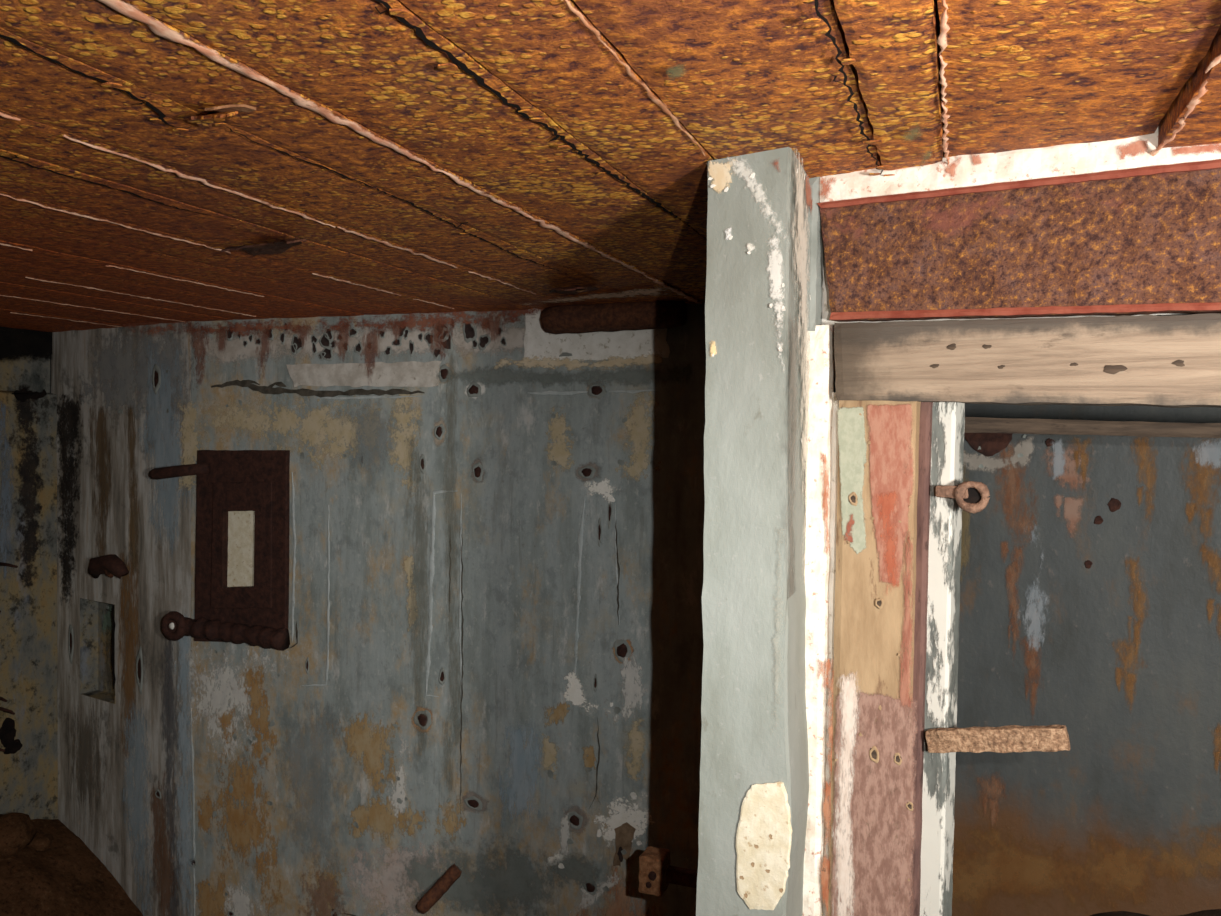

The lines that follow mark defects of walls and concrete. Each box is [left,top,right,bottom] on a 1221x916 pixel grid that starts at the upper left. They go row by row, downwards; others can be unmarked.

crack [0,34,567,274]
crack [375,0,689,226]
corrosion [805,174,836,213]
crack [803,0,895,176]
corrosion [124,308,544,383]
peeling [708,155,810,582]
water stain [0,385,83,602]
peeling [541,640,655,913]
peeling [831,404,918,916]
corrosion [961,510,970,581]
corrosion [926,724,1070,753]
corrosion [964,433,1040,706]